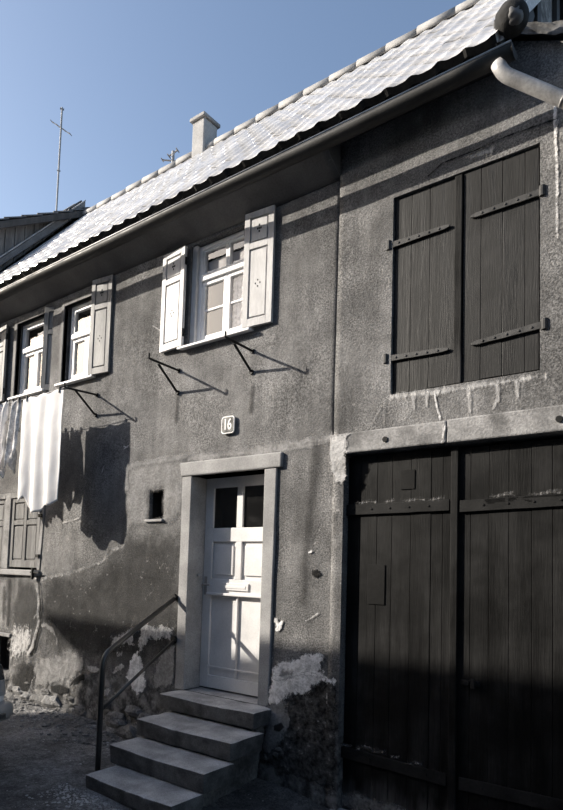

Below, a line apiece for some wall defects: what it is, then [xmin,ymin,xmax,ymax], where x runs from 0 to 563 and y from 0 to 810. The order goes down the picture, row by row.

crack [428,118,558,176]
water stain [390,375,533,443]
water stain [0,540,178,661]
flaking render [4,649,150,760]
peeling [111,623,175,695]
spalling [262,653,338,789]